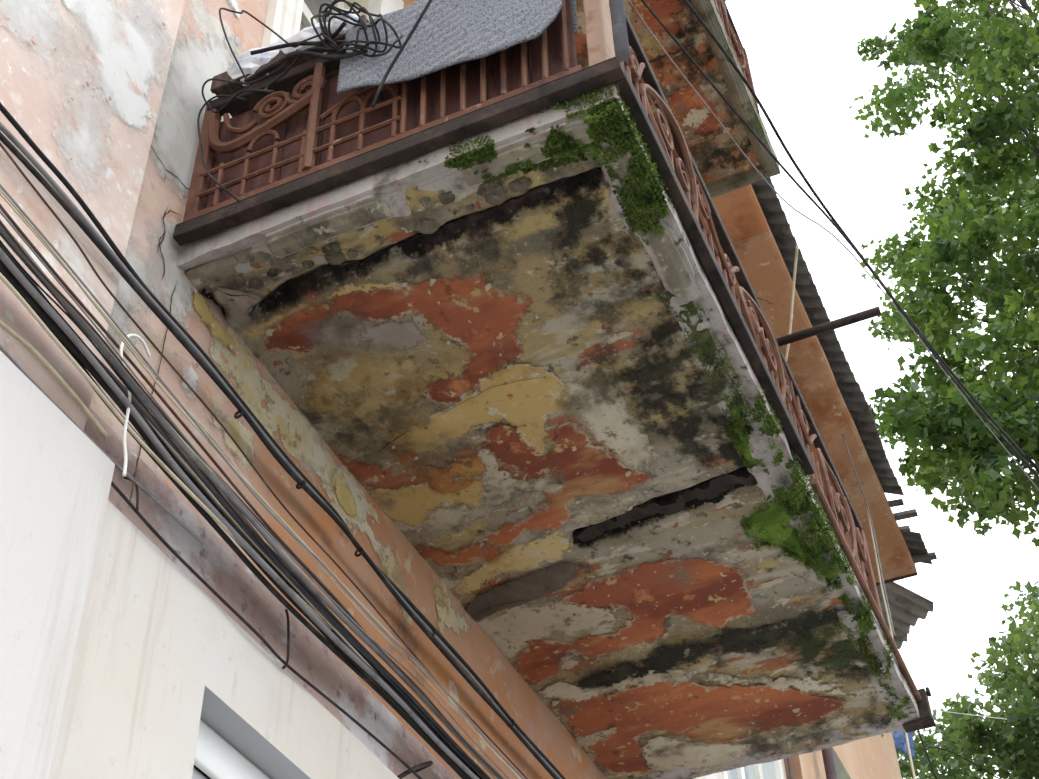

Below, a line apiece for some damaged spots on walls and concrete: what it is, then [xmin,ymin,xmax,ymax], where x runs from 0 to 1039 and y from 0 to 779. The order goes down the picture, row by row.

peeling [575,0,588,60]
peeling [623,0,691,38]
peeling [0,0,240,199]
peeling [647,79,731,142]
leakage [539,169,661,296]
leakage [592,310,744,476]
peeling [107,167,854,777]
leakage [578,607,876,692]